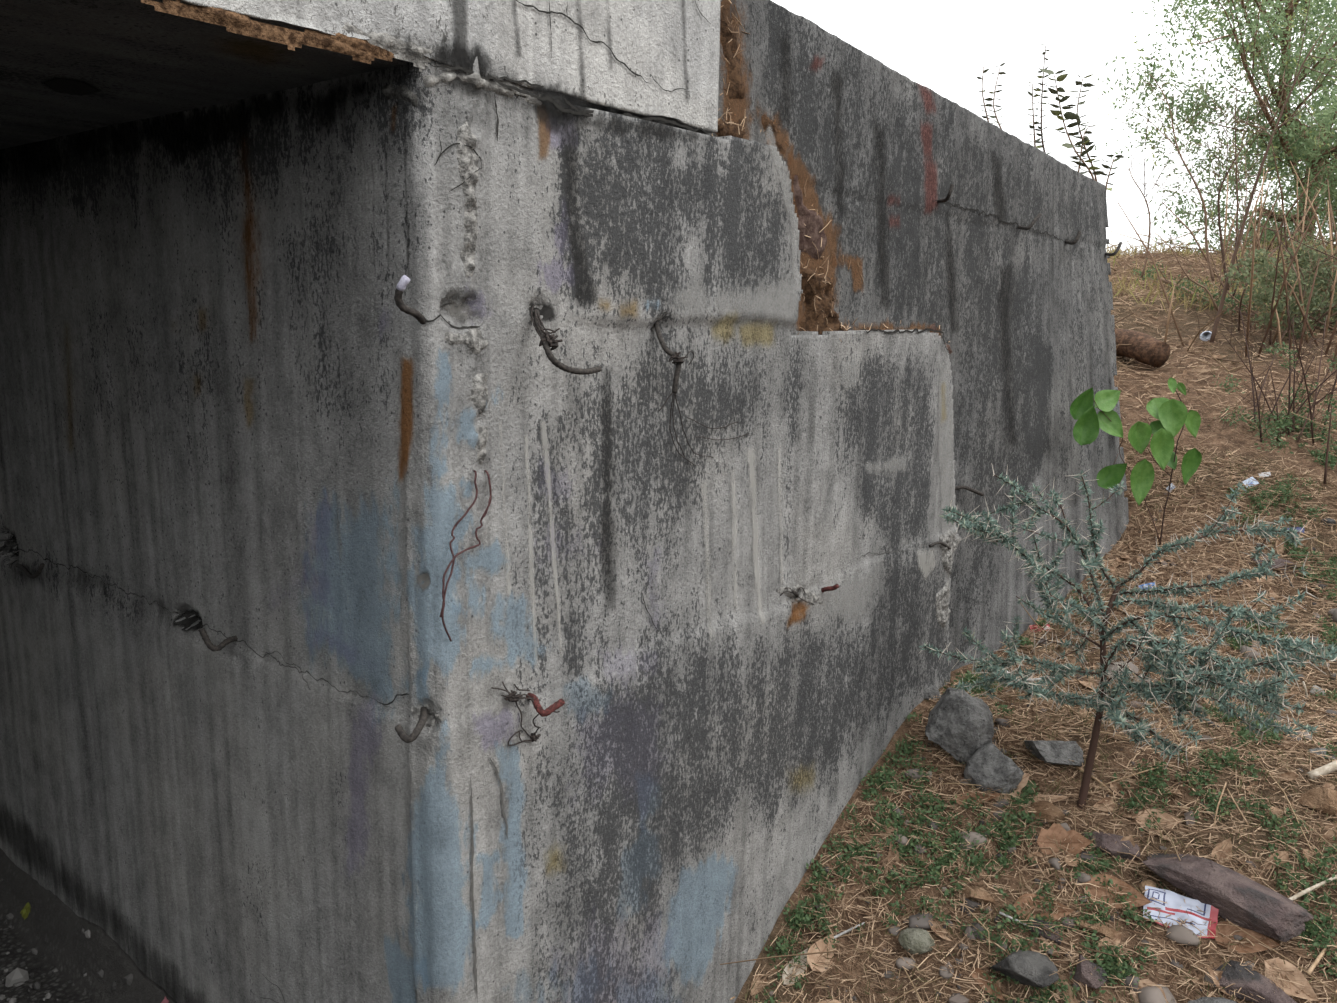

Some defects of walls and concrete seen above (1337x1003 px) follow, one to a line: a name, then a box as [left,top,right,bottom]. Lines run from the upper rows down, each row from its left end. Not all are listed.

spalling [141,0,433,72]
crack [422,0,717,192]
corrosion [242,136,258,341]
corrosion [399,358,413,480]
crack [0,539,419,722]
damp [732,451,765,623]
corrosion [788,602,807,626]
damp [918,551,935,577]